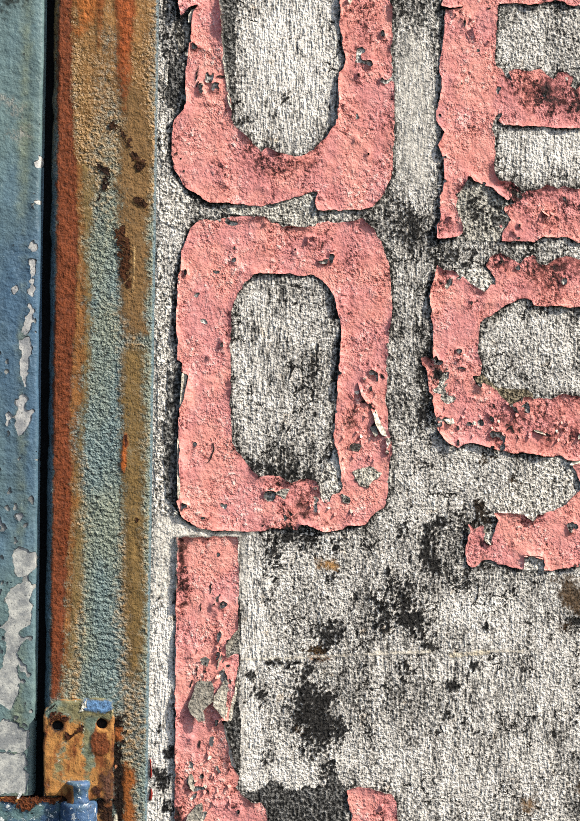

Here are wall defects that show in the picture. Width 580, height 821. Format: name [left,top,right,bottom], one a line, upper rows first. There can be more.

peeling [157,6,197,229]
rust [49,0,154,726]
water stain [393,495,495,584]
water stain [457,551,491,592]
peeling [489,457,580,521]
water stain [551,574,580,632]
peeling [0,546,38,799]
rust [64,705,137,821]
peeling [186,627,241,821]
peeling [247,759,349,821]
water stain [240,566,442,780]
water stain [423,649,530,702]